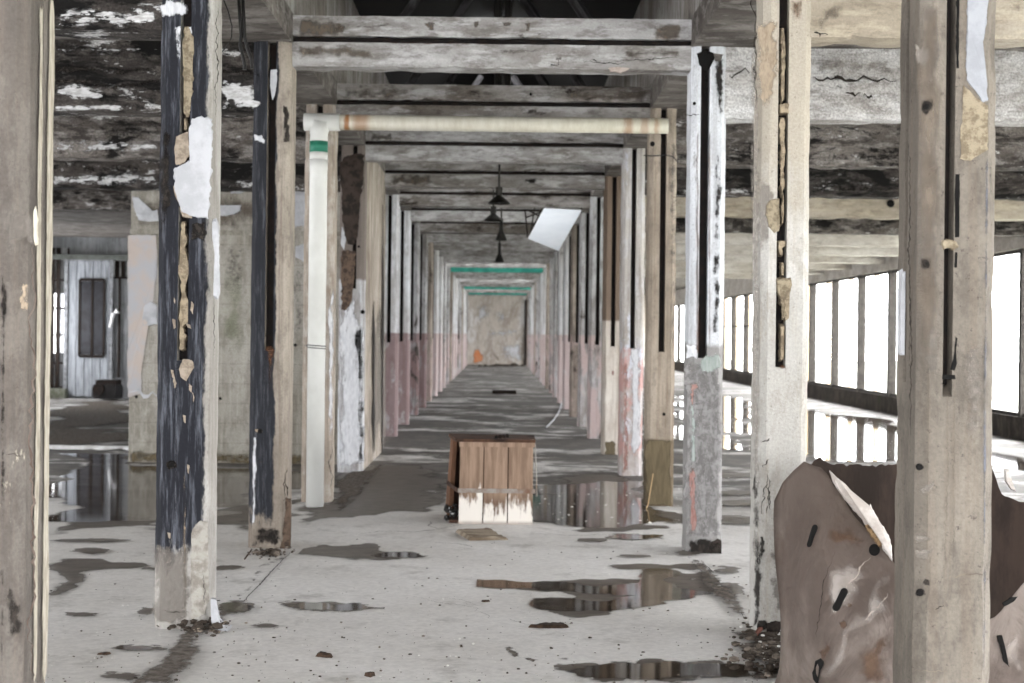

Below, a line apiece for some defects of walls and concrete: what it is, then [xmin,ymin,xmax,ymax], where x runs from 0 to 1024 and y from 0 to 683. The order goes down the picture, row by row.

crack [814,75,895,99]
peeling [960,0,988,161]
water stain [149,132,171,230]
peeling [173,26,243,300]
water stain [220,200,252,225]
peeling [171,359,194,402]
crack [761,439,771,514]